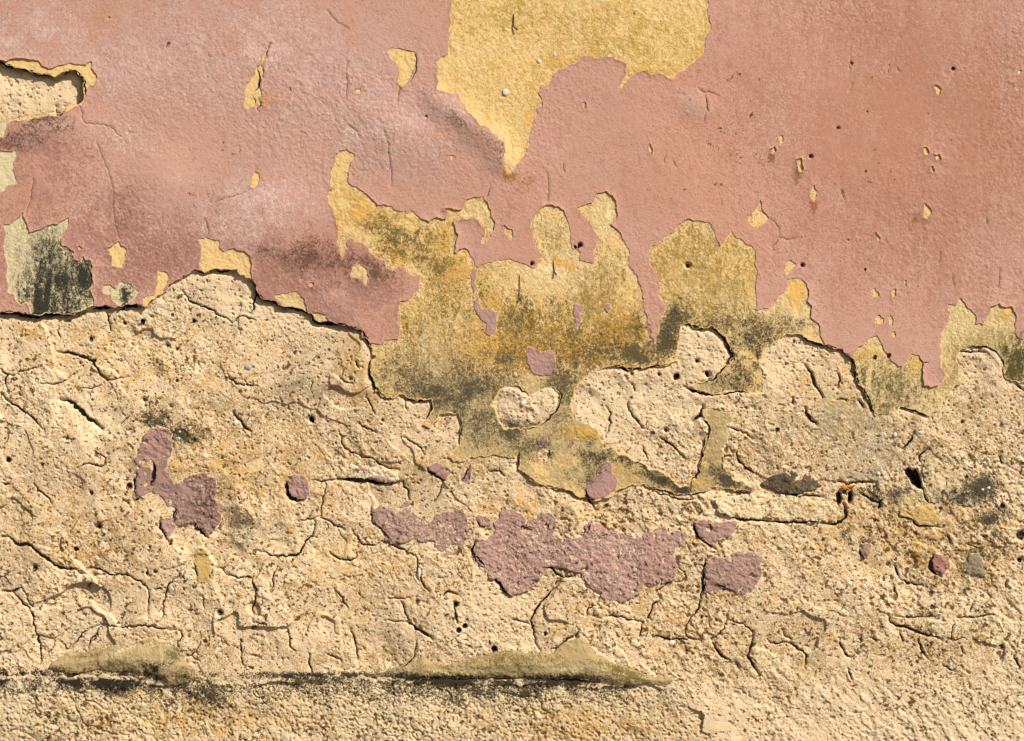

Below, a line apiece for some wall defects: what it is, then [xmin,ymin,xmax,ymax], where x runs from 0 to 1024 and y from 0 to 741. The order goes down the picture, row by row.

flaking render [0,58,98,137]
peeling [244,43,271,110]
peeling [387,47,417,87]
peeling [436,0,711,174]
crack [0,303,143,319]
crack [197,270,433,418]
crack [685,324,735,384]
crack [800,335,877,414]
flaking render [0,149,1024,741]
crack [518,389,581,498]
crack [648,418,751,496]
damp [975,688,1020,740]